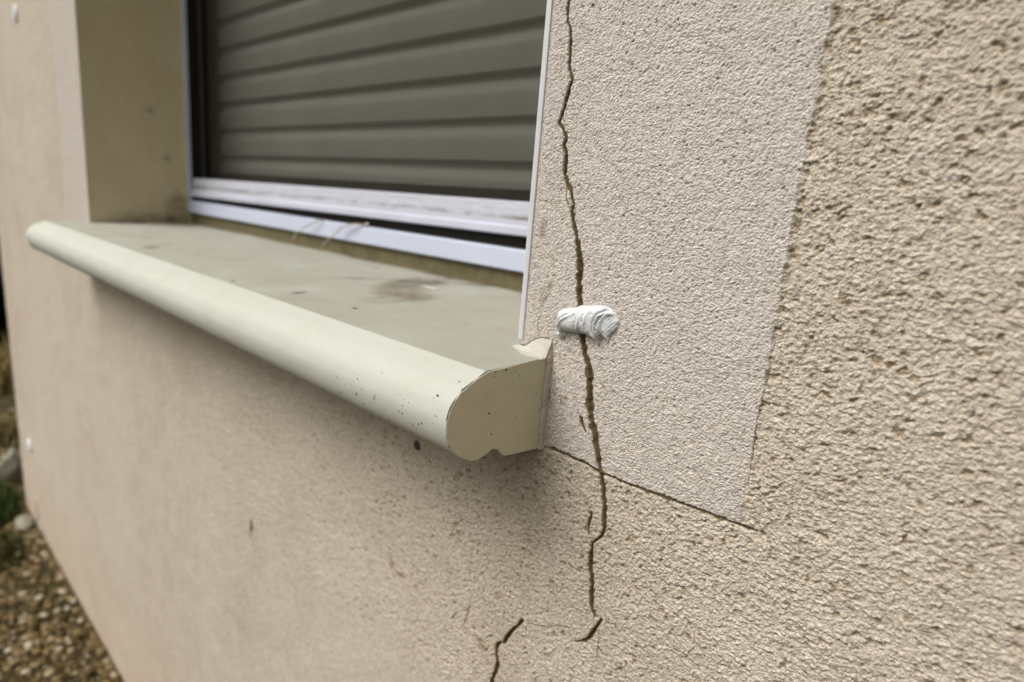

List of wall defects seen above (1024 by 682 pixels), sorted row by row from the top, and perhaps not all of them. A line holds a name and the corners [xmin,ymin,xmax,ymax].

crack [559,0,584,306]
crack [490,334,757,682]